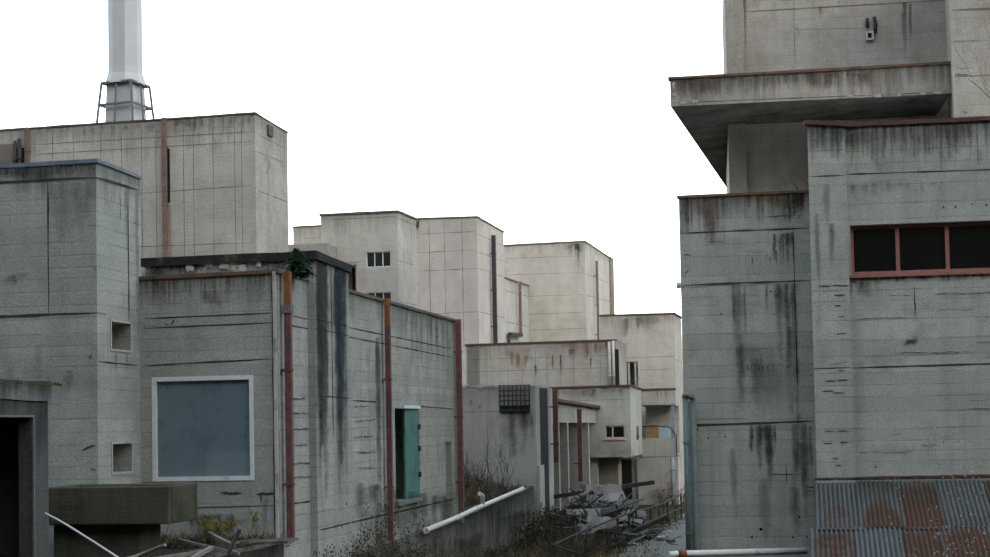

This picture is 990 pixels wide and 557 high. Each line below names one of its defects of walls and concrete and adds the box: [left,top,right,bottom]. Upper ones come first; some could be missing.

leakage [308,260,347,444]
leakage [750,424,776,463]